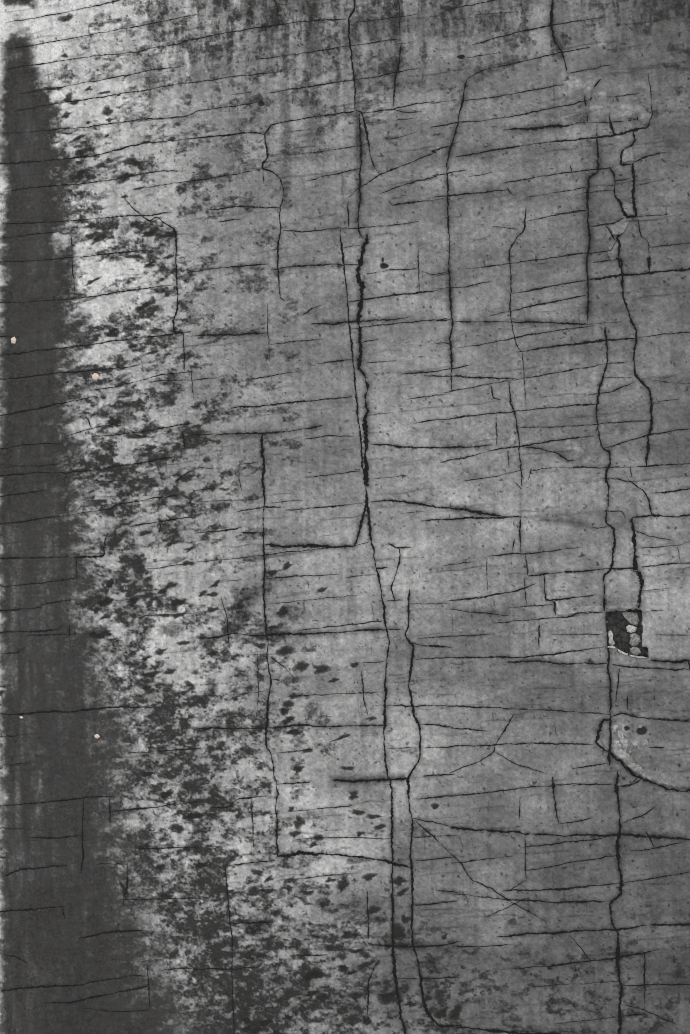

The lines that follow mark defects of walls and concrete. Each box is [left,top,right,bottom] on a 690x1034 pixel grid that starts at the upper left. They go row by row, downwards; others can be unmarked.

crack [6,0,118,23]
crack [9,14,342,69]
water stain [432,0,465,38]
water stain [479,3,528,80]
crack [18,92,258,133]
crack [17,66,264,111]
crack [0,194,330,416]
crack [218,425,322,512]
water stain [0,0,453,1034]
peeling [545,569,648,658]
crack [425,716,543,776]
crack [421,786,543,799]